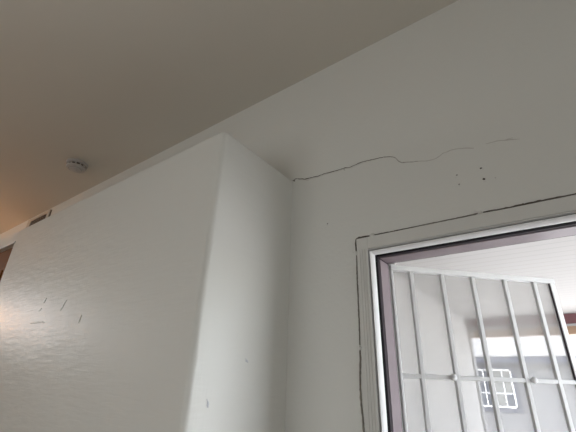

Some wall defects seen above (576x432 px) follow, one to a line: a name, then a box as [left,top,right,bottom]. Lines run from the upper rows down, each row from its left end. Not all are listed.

crack [293,148,473,182]
crack [355,193,576,432]